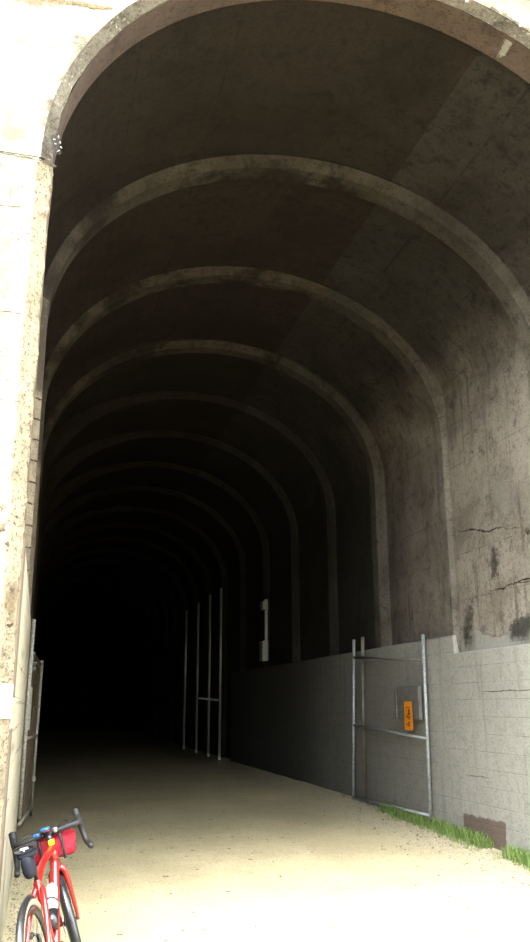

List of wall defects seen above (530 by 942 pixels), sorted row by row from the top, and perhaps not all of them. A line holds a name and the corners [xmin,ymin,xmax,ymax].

crack [458,526,519,552]
crack [491,578,530,591]